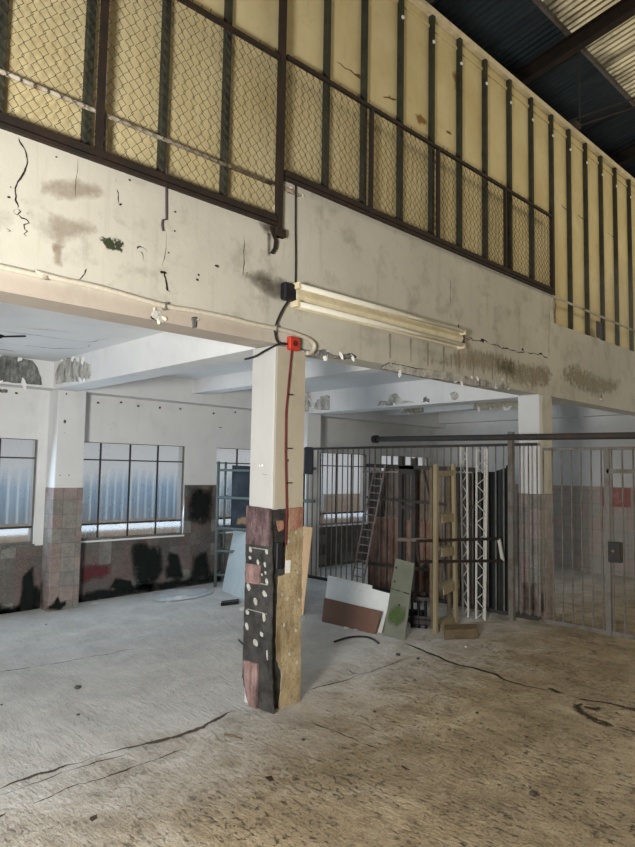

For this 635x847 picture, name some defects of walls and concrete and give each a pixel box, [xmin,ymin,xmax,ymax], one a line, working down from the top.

crack [8,139,29,237]
spalling [0,355,42,394]
spalling [56,356,91,384]
crack [0,711,232,817]